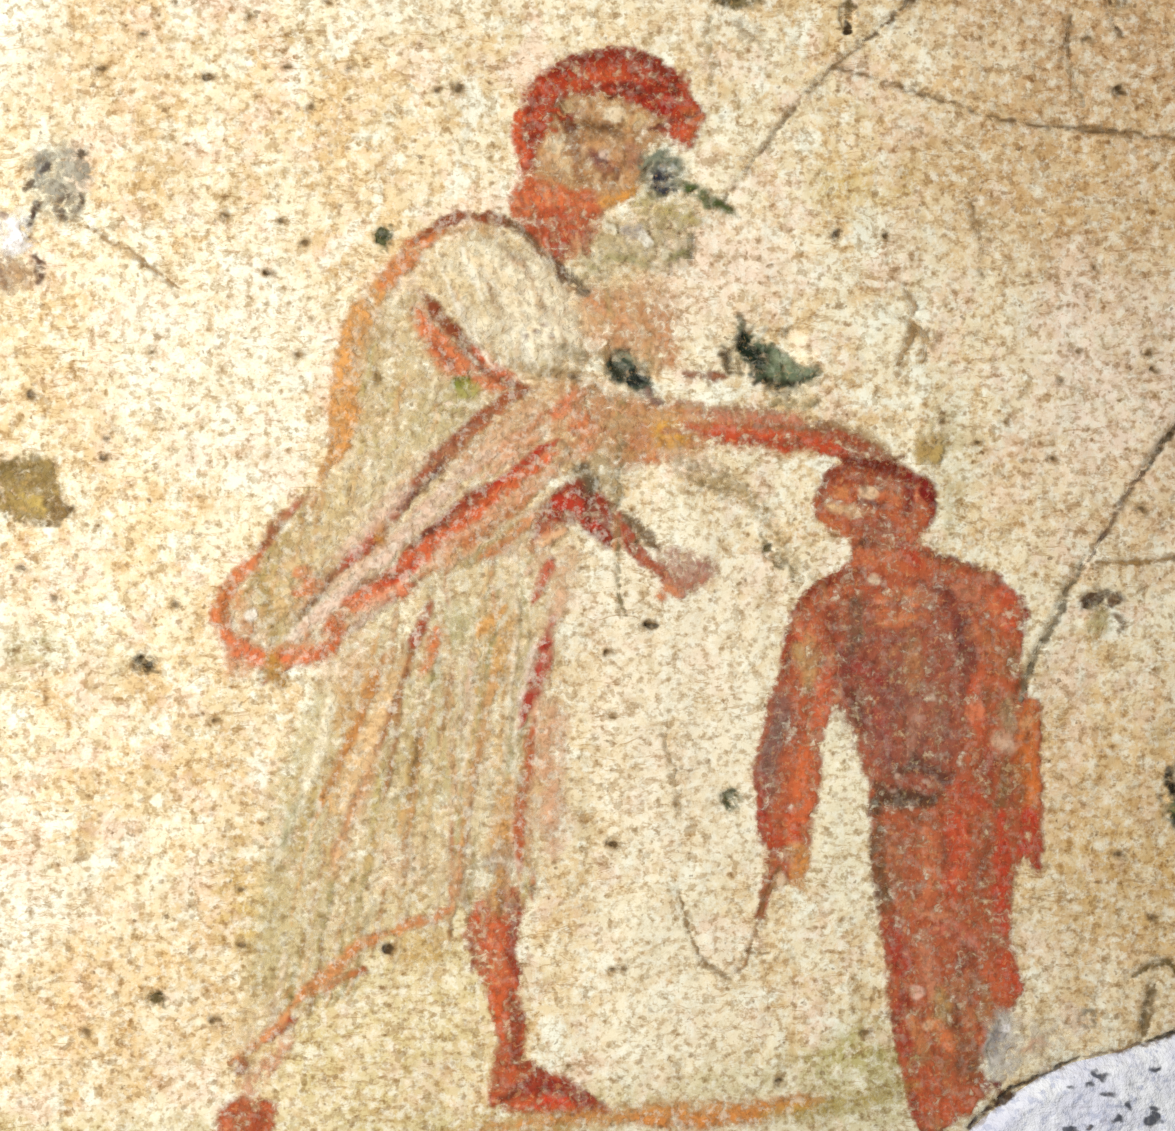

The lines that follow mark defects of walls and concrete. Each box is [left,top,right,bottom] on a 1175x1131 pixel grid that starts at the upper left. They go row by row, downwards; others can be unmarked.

crack [724,0,1175,199]
crack [1018,423,1175,702]
leakage [1164,764,1175,827]
flaking render [984,1012,1046,1079]
spalling [1086,1071,1113,1096]
spalling [1144,1106,1160,1126]